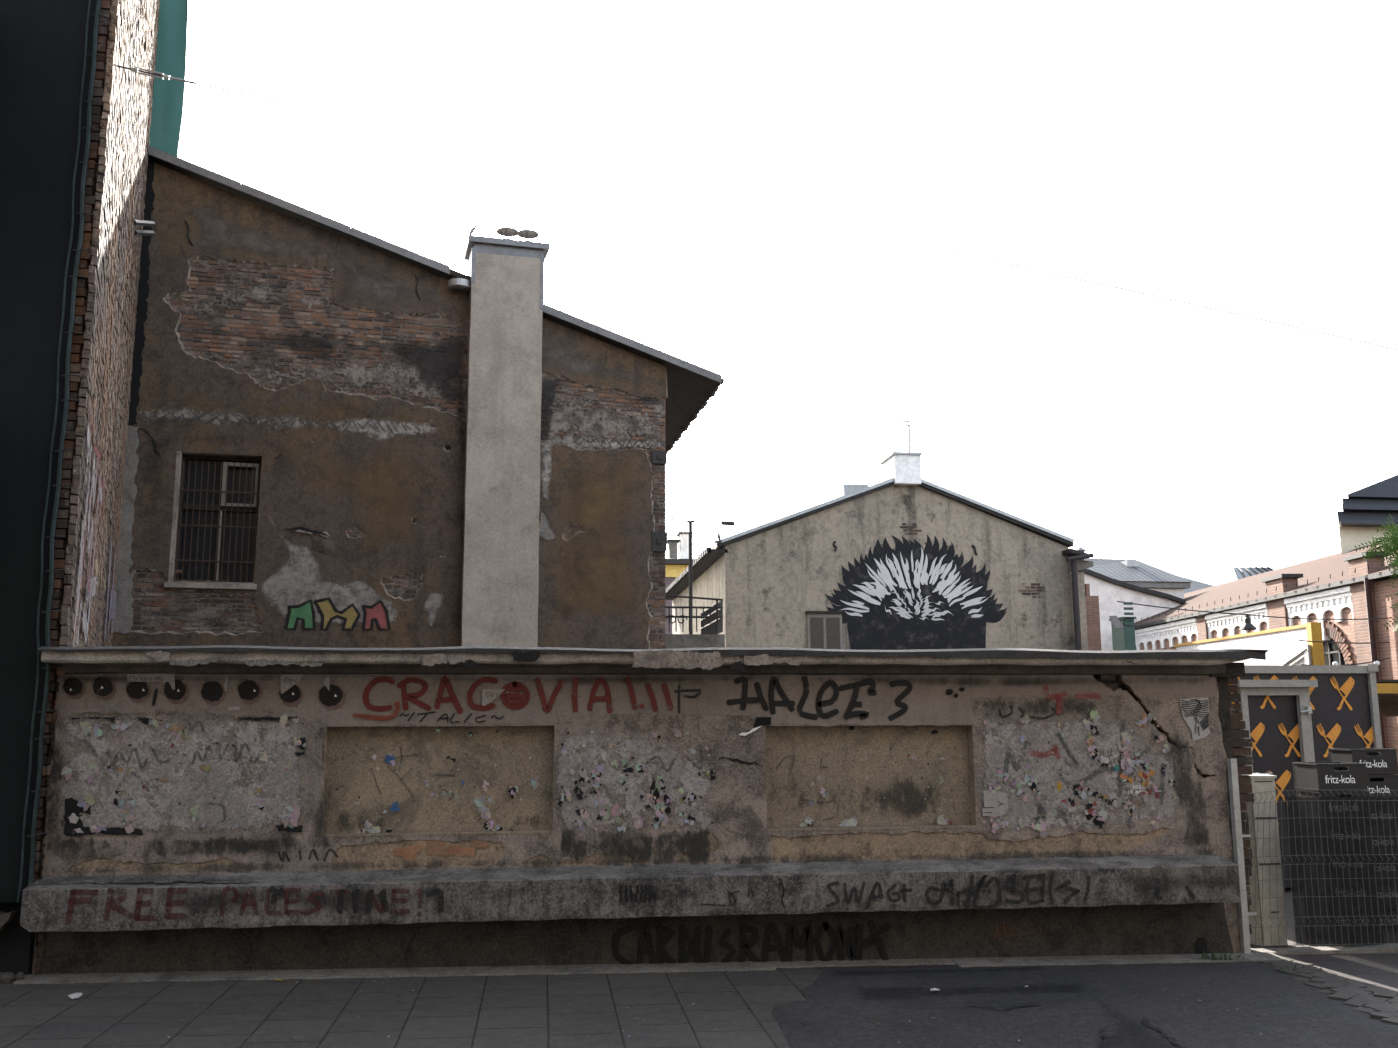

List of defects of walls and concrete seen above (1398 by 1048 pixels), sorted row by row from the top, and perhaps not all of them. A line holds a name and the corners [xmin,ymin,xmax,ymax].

flaking render [138,256,469,439]
flaking render [539,372,666,539]
flaking render [632,551,802,672]
crack [1093,660,1209,777]